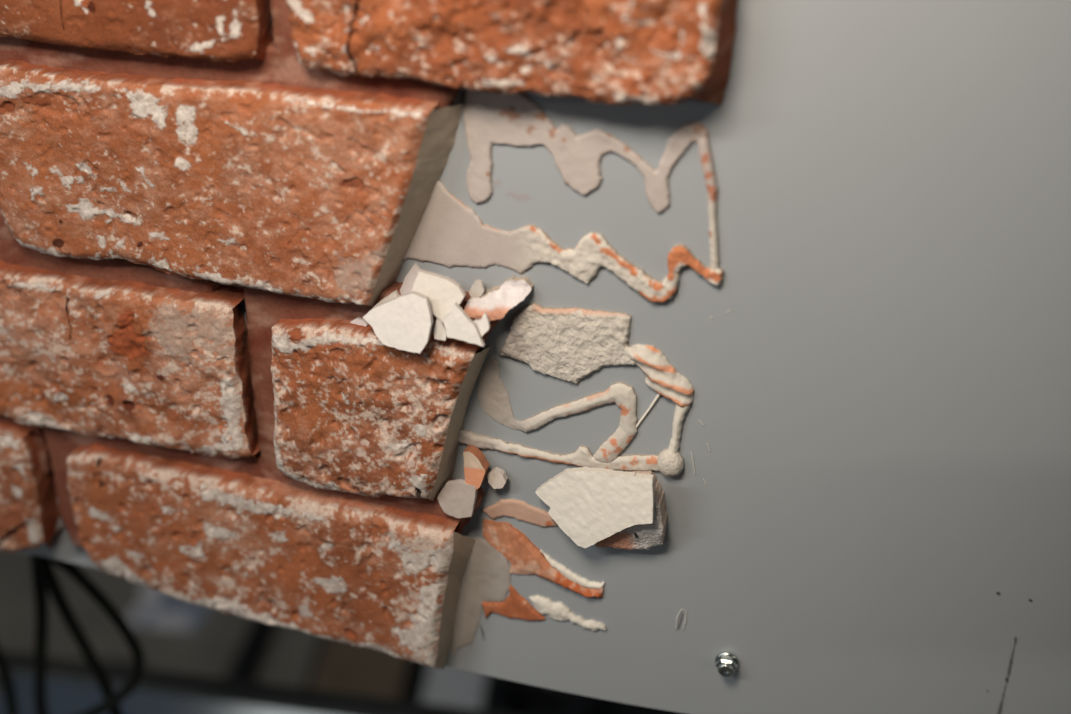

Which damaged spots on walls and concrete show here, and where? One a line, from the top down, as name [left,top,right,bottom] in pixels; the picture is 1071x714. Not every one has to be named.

crack [345,1,360,75]
peeling [613,93,662,105]
flaking render [487,467,508,489]
flaking render [535,466,668,550]